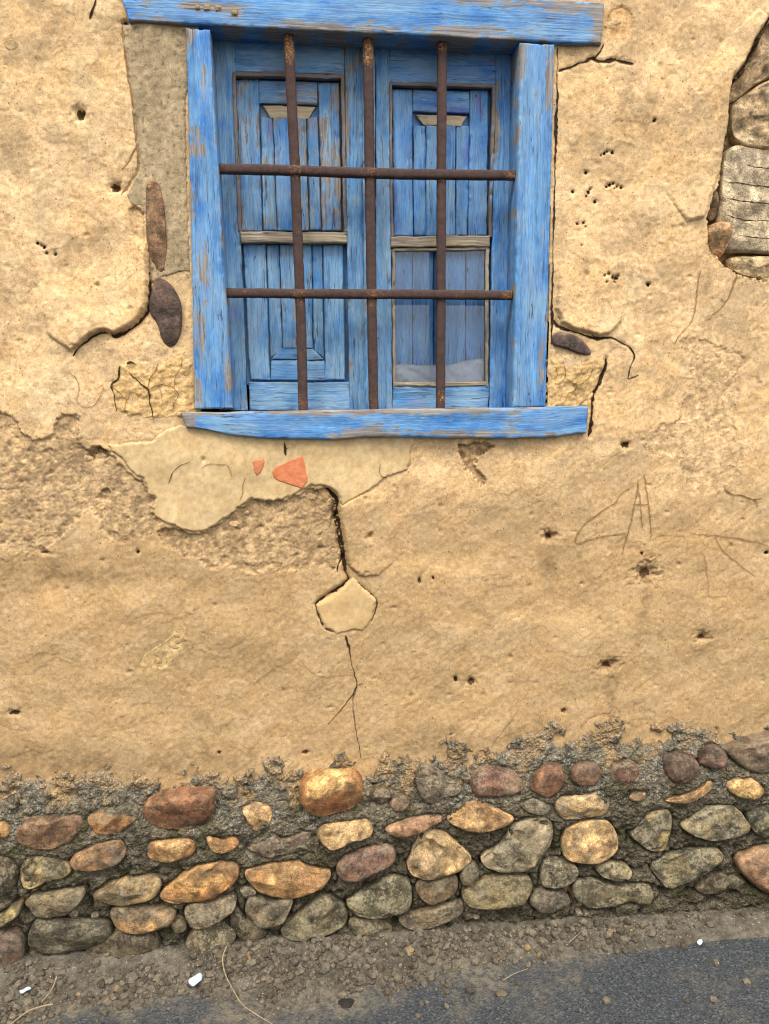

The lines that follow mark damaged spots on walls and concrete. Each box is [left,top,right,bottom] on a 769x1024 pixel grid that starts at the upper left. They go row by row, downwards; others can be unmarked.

crack [69,272,152,407]
crack [550,44,638,437]
spalling [706,243,769,283]
spalling [0,411,341,575]
crack [253,488,378,758]